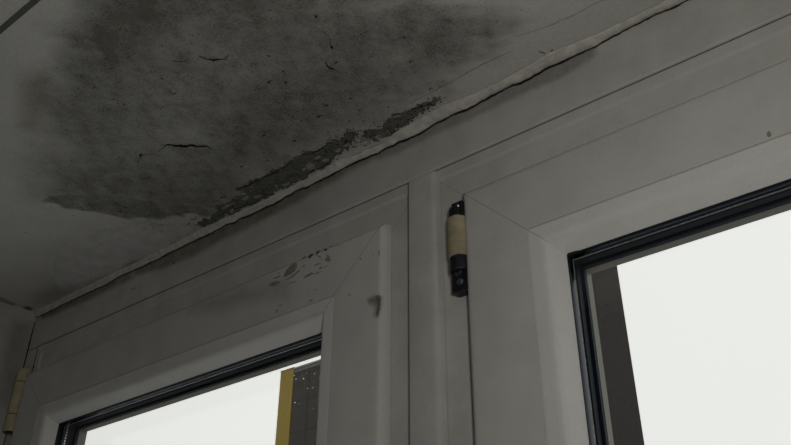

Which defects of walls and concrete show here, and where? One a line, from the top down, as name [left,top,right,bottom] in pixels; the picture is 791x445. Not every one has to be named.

damp [31,0,492,269]
flaking render [197,97,442,227]
crack [23,0,688,368]